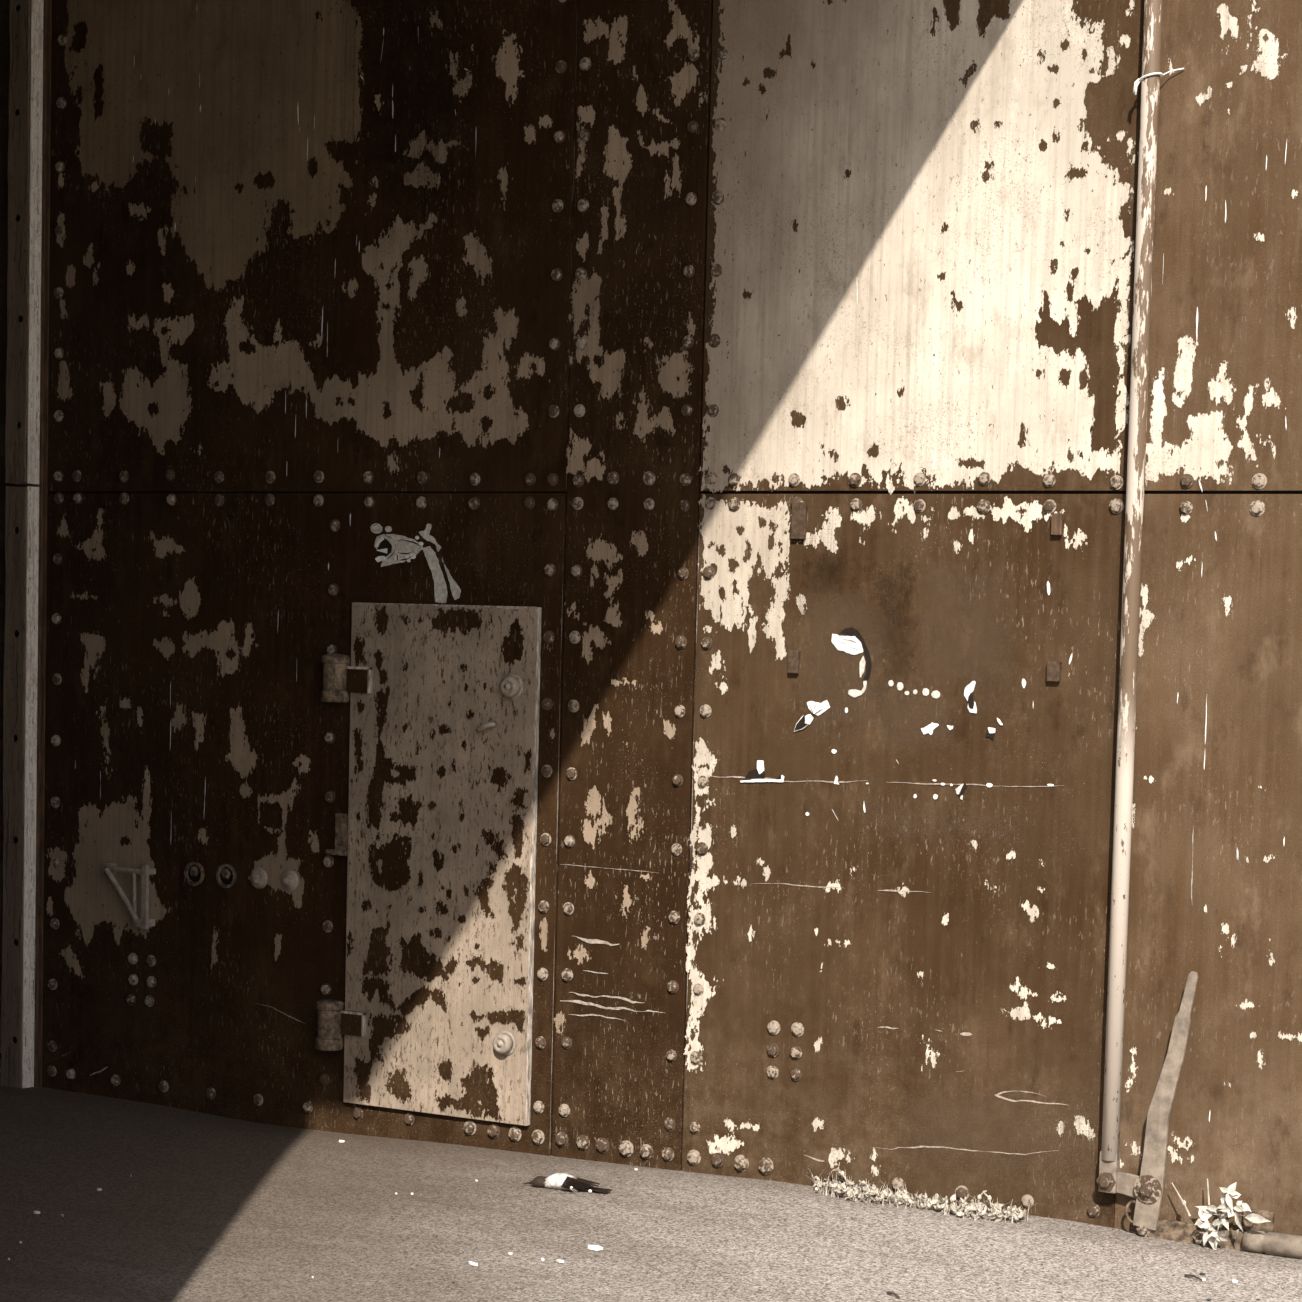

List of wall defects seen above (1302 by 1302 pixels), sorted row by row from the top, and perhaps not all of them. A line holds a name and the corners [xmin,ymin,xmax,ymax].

peeling [60,0,553,475]
peeling [563,0,1138,665]
peeling [1145,335,1286,485]
peeling [153,575,259,678]
peeling [581,704,628,747]
peeling [709,650,728,695]
peeling [45,770,170,979]
peeling [225,705,320,909]
peeling [581,785,644,849]
peeling [621,870,650,919]
peeling [683,737,747,1073]
peeling [1021,886,1045,922]